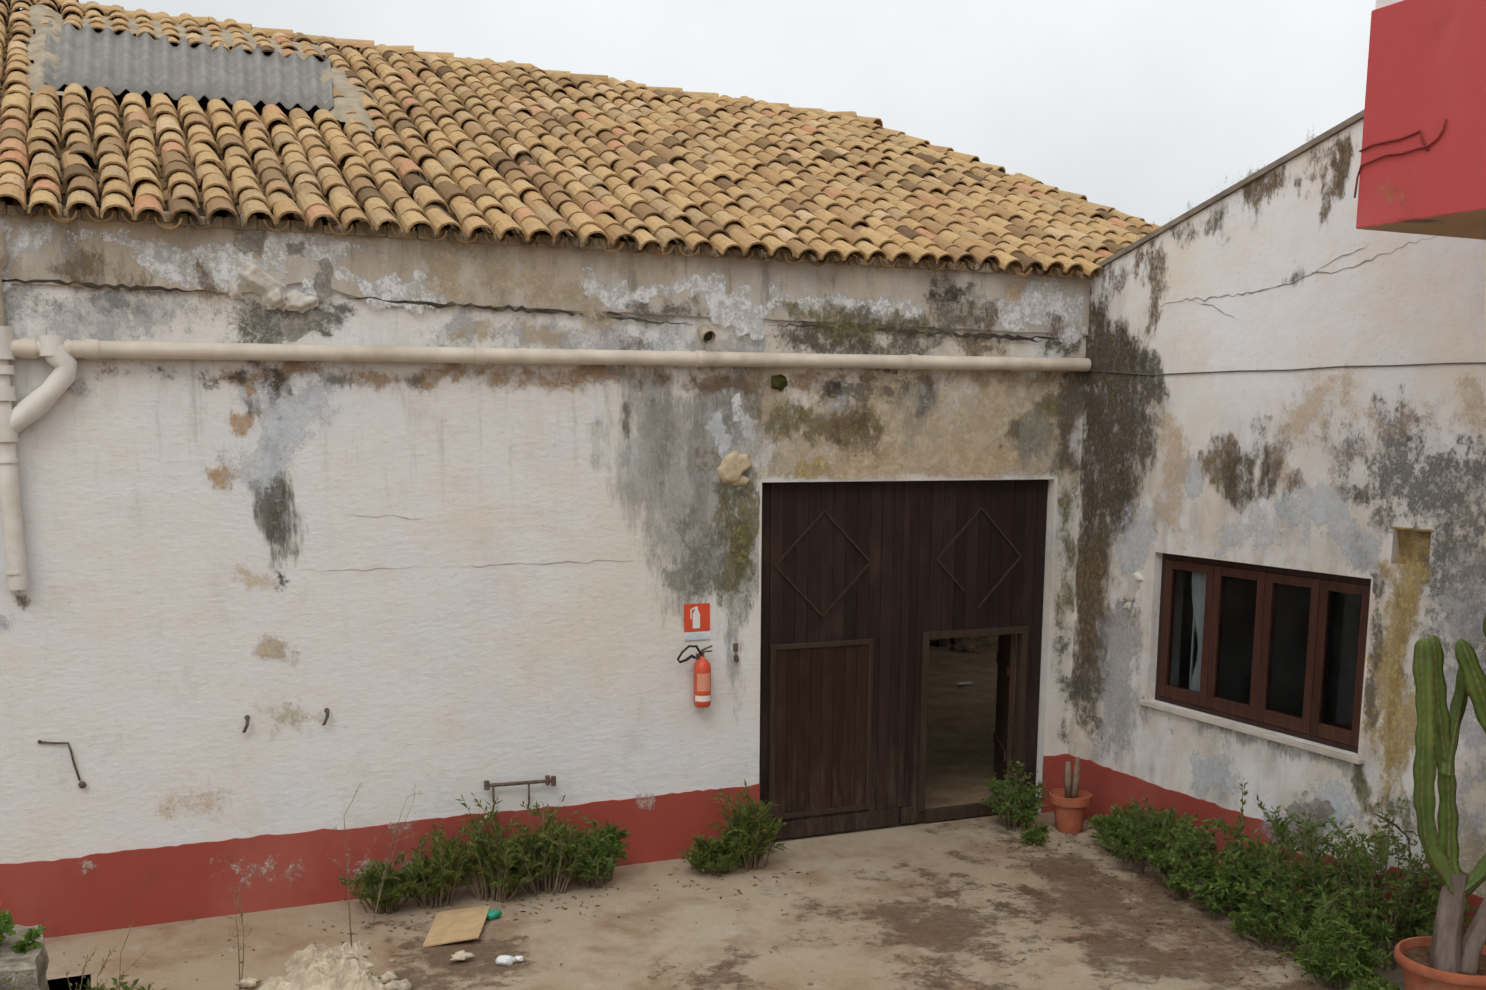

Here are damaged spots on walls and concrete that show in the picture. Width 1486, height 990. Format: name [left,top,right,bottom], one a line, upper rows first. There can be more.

damp [1242,132,1354,223]
crack [2,279,219,294]
peeling [0,215,447,344]
crack [334,297,698,325]
crack [1142,236,1435,320]
damp [201,363,293,417]
damp [249,438,298,561]
damp [421,203,1486,848]